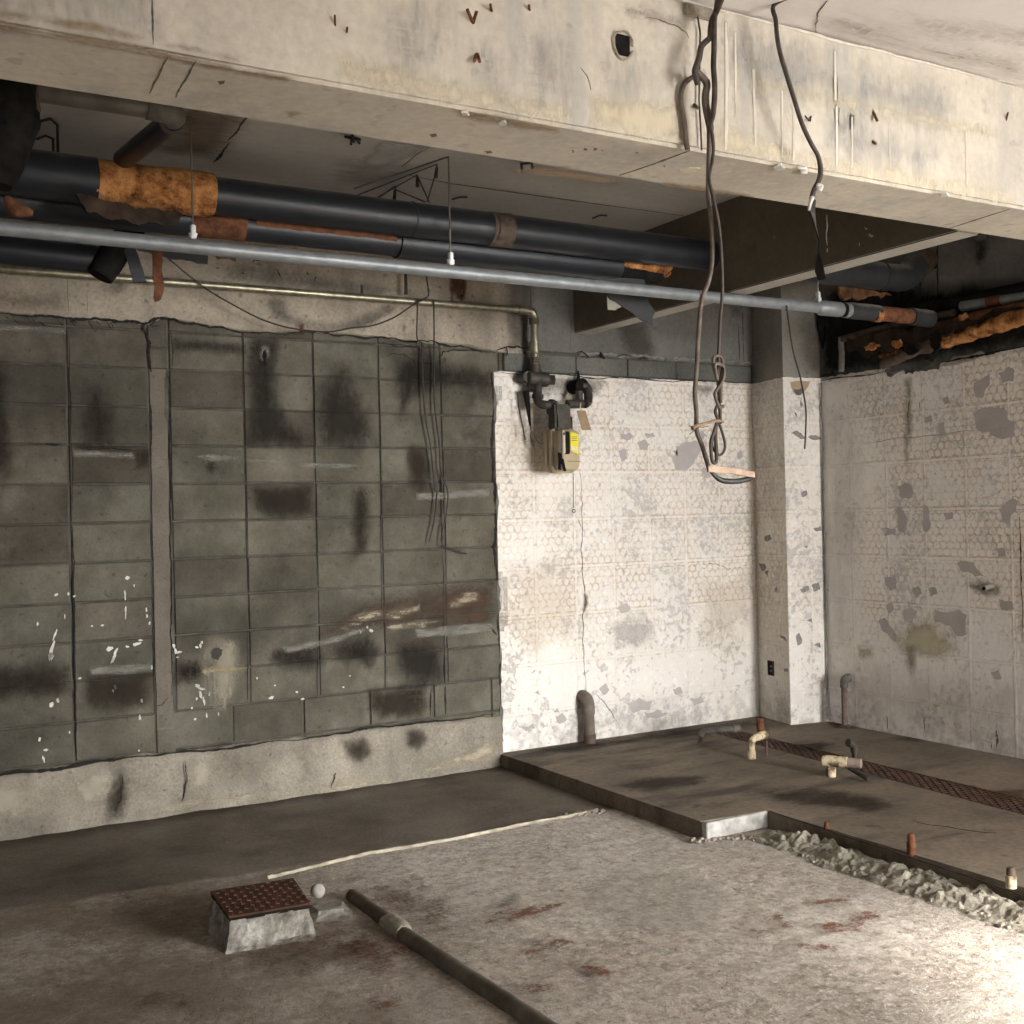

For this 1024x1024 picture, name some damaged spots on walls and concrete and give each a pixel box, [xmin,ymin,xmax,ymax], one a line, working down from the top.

spalling [885,351,985,377]
peeling [619,432,655,462]
peeling [672,430,711,479]
peeling [882,482,914,536]
crack [578,476,616,720]
peeling [878,576,937,643]
peeling [934,610,967,636]
peeling [627,698,669,719]
crack [0,713,496,802]
damp [349,740,370,760]
damp [410,731,426,746]
damp [77,775,126,815]